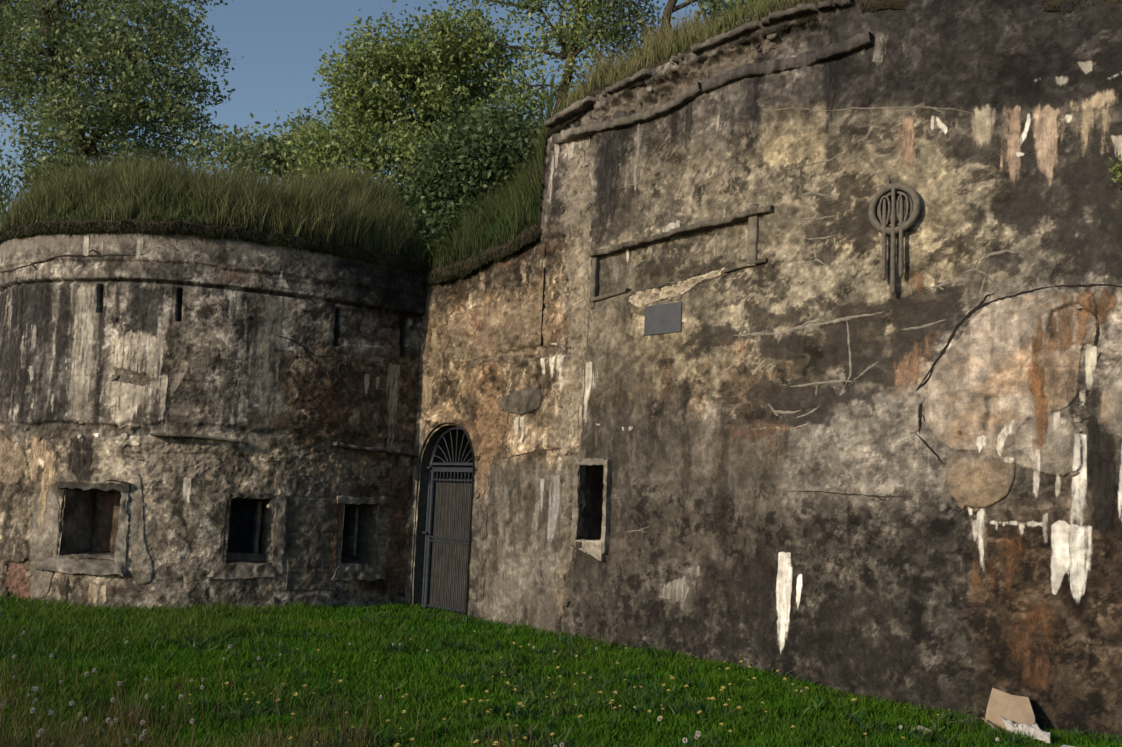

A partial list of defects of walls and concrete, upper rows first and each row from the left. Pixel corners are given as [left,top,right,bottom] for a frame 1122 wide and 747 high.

leakage [0,284,186,525]
crack [733,249,1122,464]
leakage [968,344,1122,600]
rust [1028,288,1116,448]
leakage [660,550,913,699]